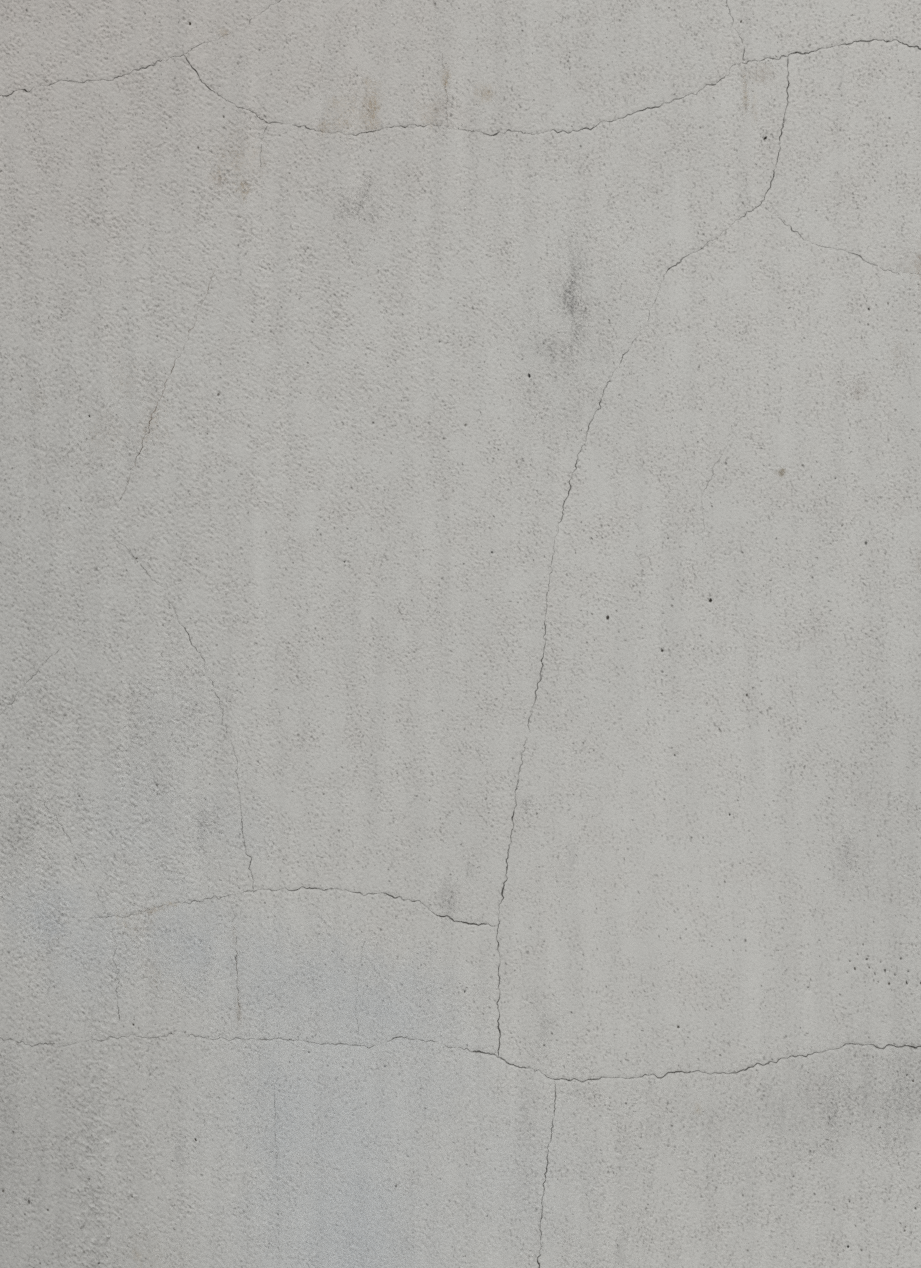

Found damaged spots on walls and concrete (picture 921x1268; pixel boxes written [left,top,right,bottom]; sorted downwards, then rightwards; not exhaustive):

crack [482,2,921,271]
crack [176,556,921,1268]